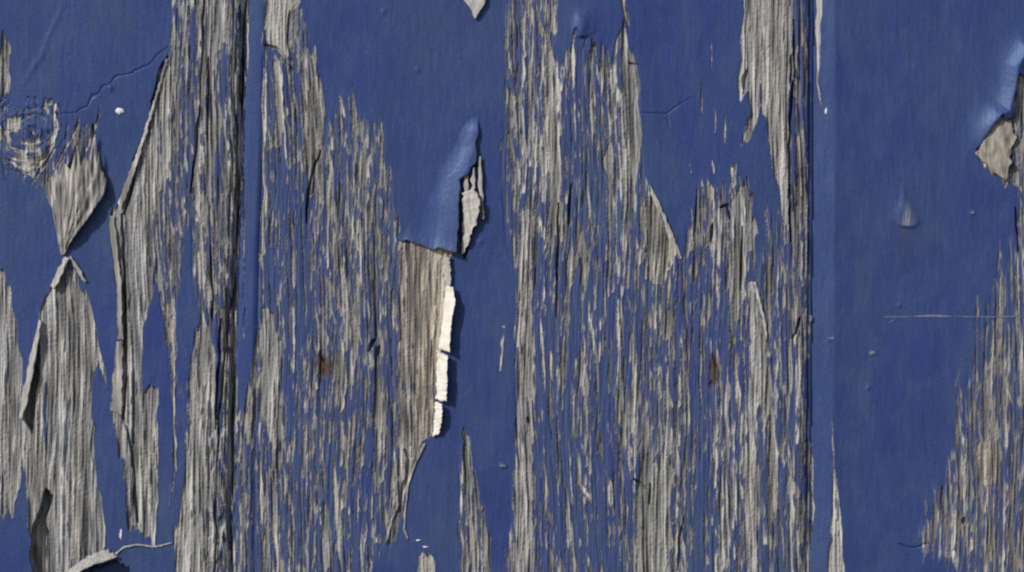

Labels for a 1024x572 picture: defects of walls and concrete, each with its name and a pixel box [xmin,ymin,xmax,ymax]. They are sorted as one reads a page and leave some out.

crack [57,44,171,118]
peeling [0,0,485,572]
peeling [457,426,491,572]
peeling [498,0,827,572]
peeling [827,419,845,572]
peeling [916,74,1024,572]